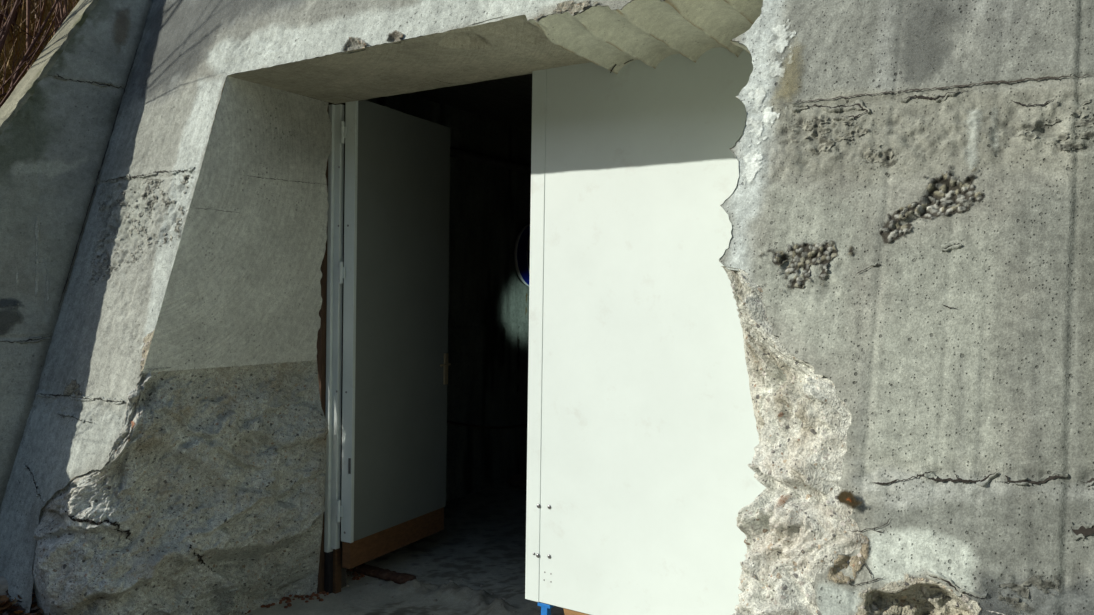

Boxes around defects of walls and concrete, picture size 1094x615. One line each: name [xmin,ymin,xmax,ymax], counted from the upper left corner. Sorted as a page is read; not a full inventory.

spalling [534,0,601,21]
crack [777,74,1090,121]
leakage [0,299,22,334]
spalling [721,266,981,615]
spalling [32,329,328,615]
crack [873,471,1094,487]
crack [23,464,132,541]
corrosion [837,490,862,508]
crack [1070,521,1094,541]
crack [926,570,987,599]